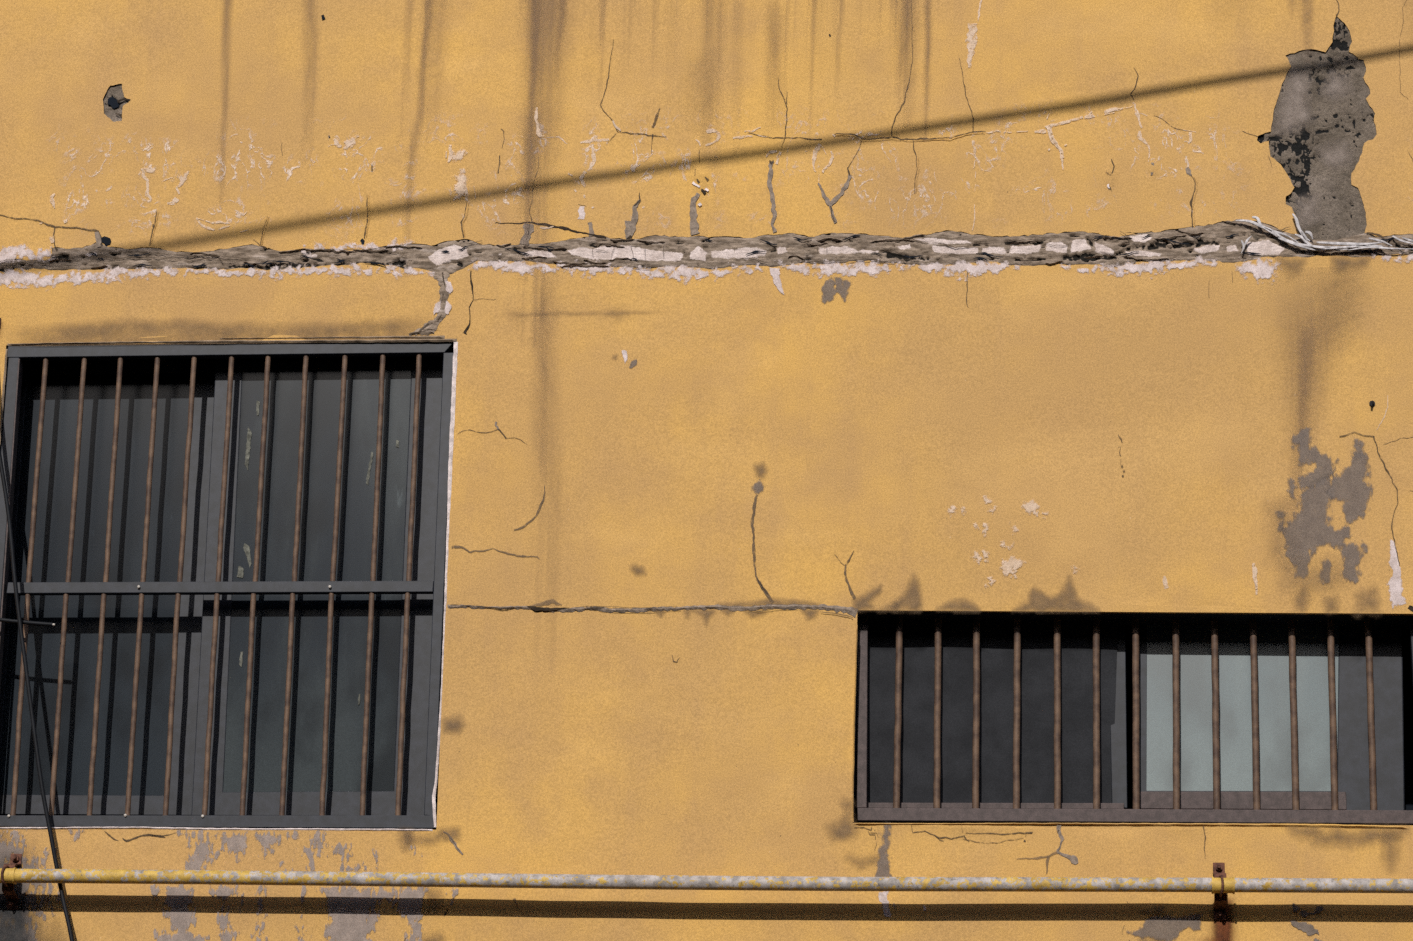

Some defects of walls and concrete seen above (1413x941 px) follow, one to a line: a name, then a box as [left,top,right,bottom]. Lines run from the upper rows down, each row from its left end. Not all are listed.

flaking render [103,84,130,122]
crack [600,39,666,153]
crack [751,0,985,233]
flaking render [1125,1,1404,254]
crack [460,156,641,334]
crack [689,193,700,235]
crack [1185,156,1198,228]
crack [1339,400,1413,565]
crack [447,485,858,618]
peeling [0,829,68,941]
peeling [150,830,428,941]